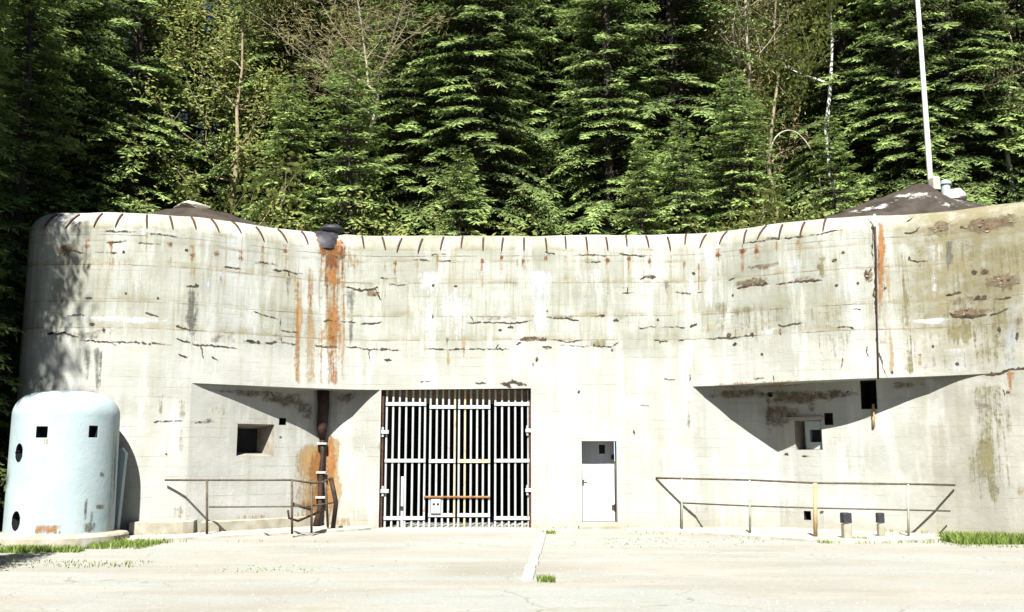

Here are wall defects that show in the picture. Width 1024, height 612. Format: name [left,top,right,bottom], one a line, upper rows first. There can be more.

spalling [930,212,1013,233]
damp [187,291,196,335]
rust [294,237,355,384]
spalling [732,277,767,296]
rust [878,223,890,307]
spalling [952,269,1020,316]
damp [971,386,1010,501]
rust [297,436,349,526]
rust [35,525,60,533]